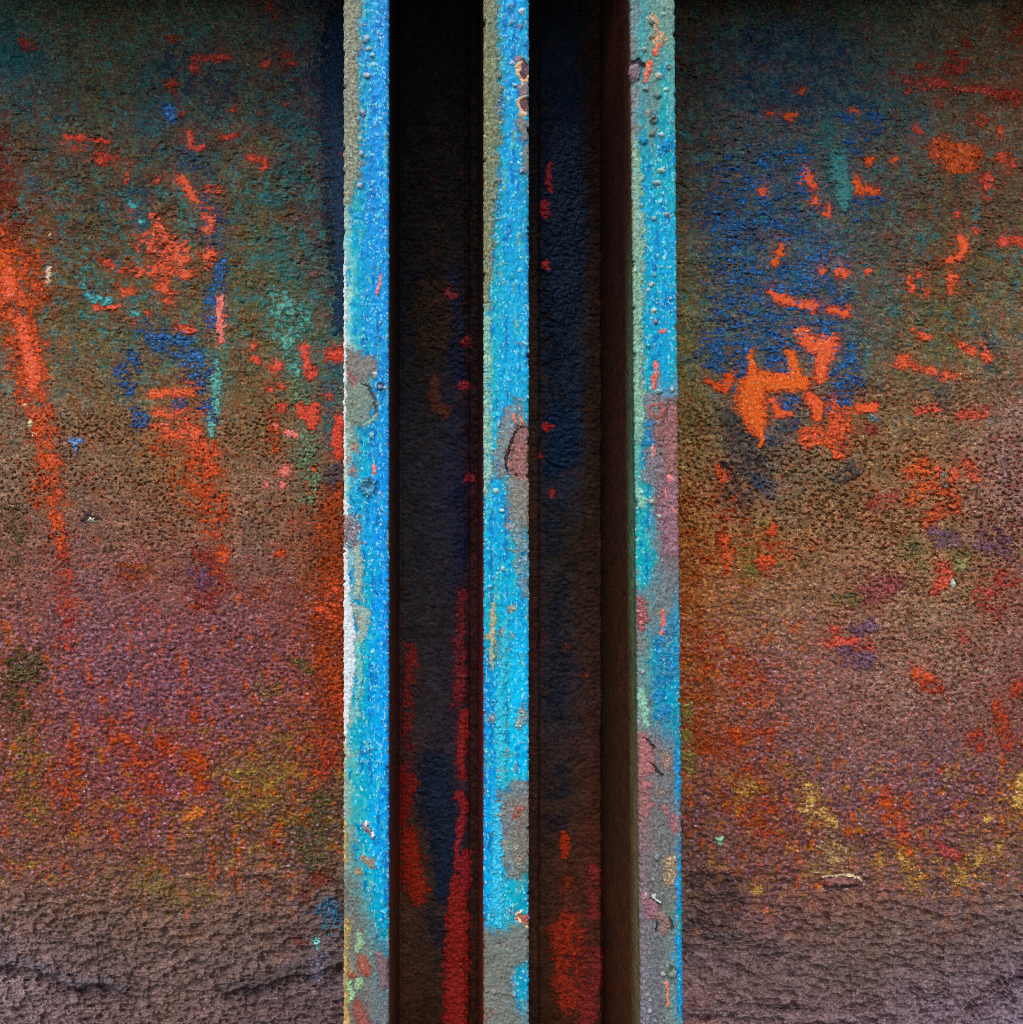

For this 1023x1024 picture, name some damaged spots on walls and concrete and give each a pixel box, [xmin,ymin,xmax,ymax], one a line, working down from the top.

peeling [249,0,383,508]
peeling [537,115,594,334]
peeling [399,0,583,1024]
spalling [640,857,898,1024]